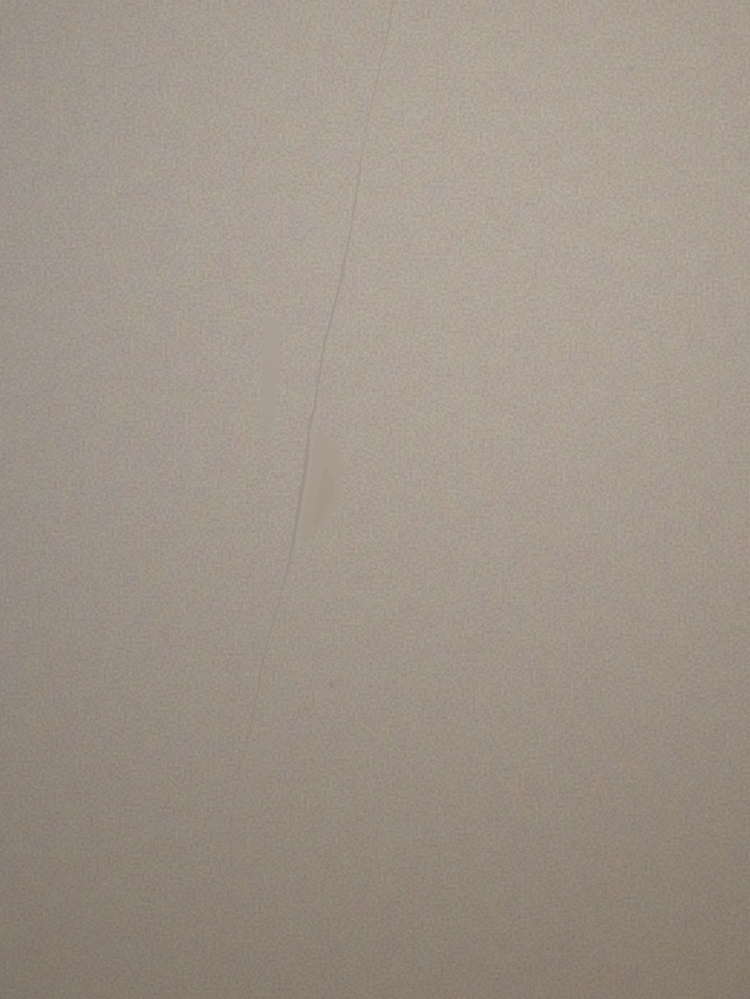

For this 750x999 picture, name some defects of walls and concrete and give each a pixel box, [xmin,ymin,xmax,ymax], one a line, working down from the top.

crack [229,0,394,831]